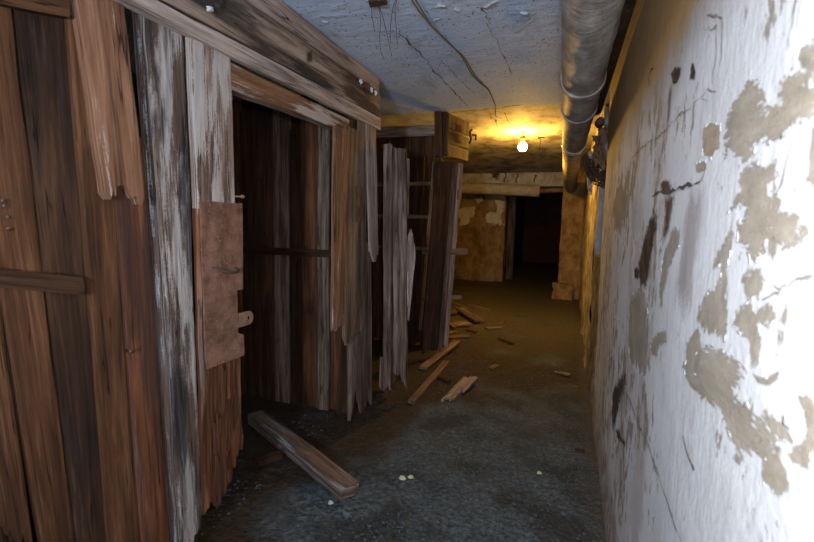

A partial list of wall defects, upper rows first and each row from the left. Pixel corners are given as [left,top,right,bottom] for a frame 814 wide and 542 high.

crack [398,30,541,127]
crack [631,1,723,158]
peeling [682,44,814,497]
crack [762,273,814,300]
crack [622,389,681,542]